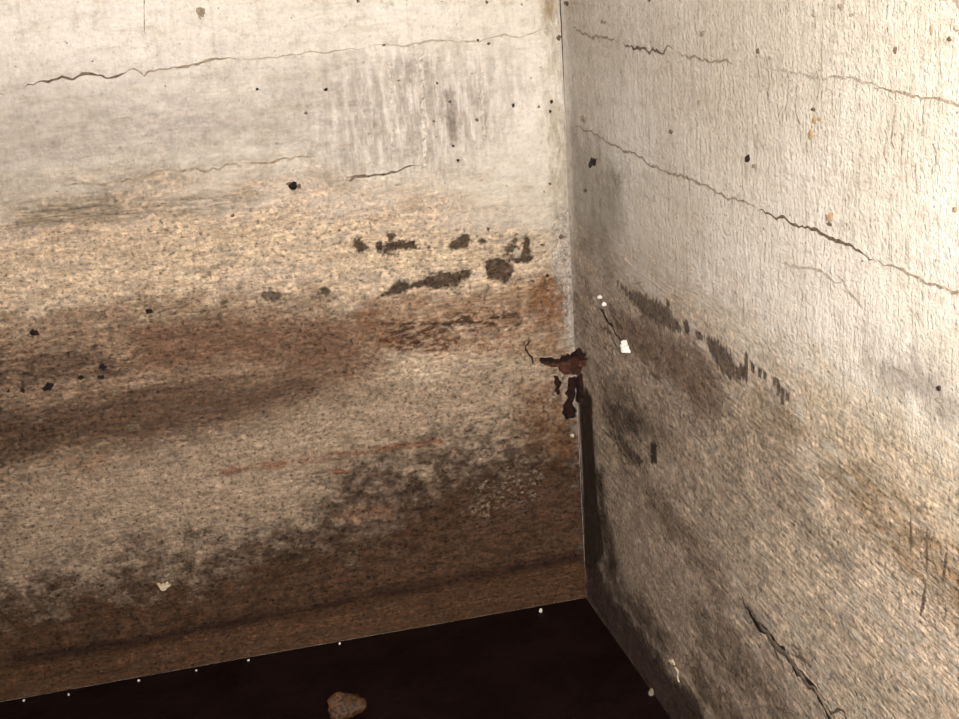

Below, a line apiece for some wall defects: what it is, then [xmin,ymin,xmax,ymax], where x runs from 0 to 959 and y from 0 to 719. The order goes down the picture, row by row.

crack [24,29,543,88]
crack [573,126,959,295]
peeling [353,233,429,255]
peeling [381,268,471,296]
peeling [448,234,486,250]
peeling [485,235,533,283]
crack [782,263,863,309]
peeling [616,280,789,404]
water stain [0,184,959,719]
crack [743,600,847,719]